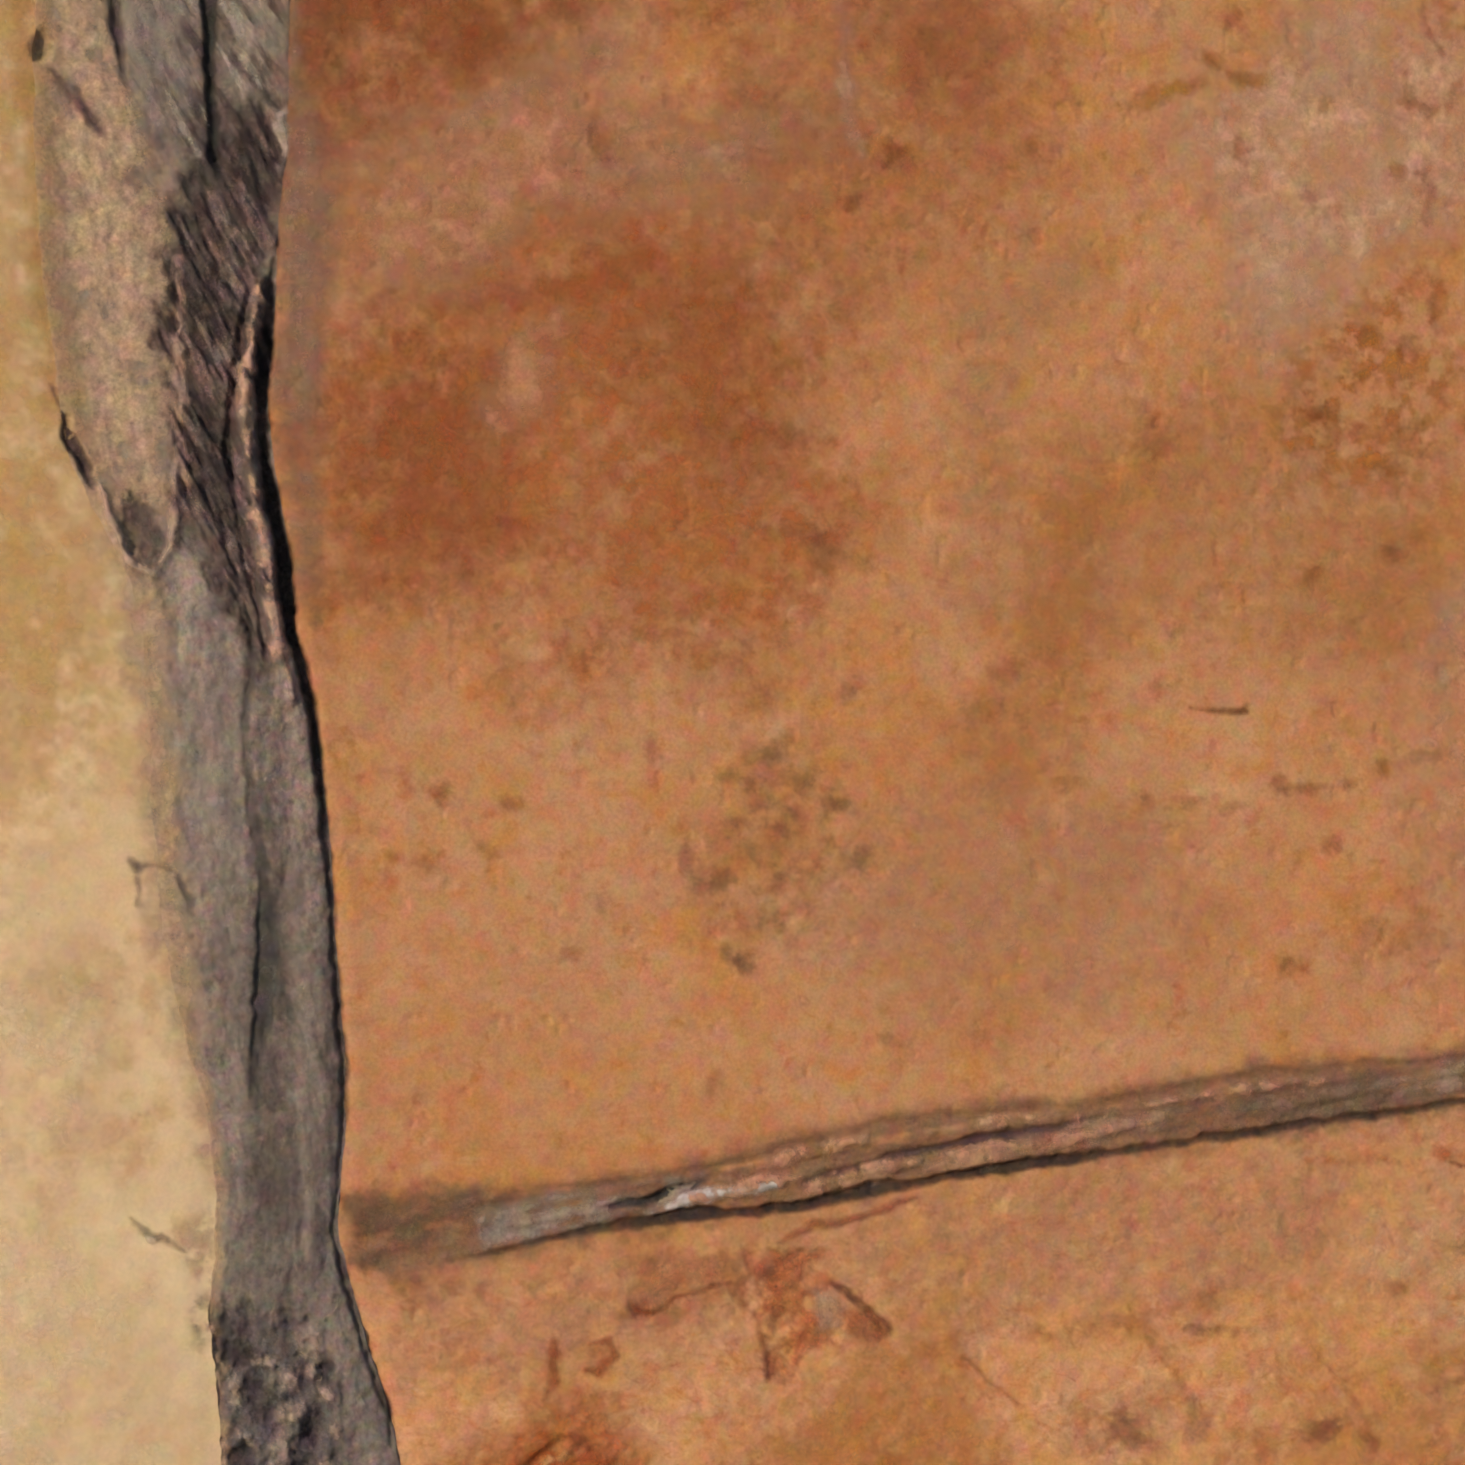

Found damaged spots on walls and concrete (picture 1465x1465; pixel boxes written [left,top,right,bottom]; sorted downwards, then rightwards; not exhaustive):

crack [202,0,220,178]
crack [225,281,348,1131]
crack [132,862,143,871]
crack [180,881,191,903]
flaking render [345,1050,1465,1279]
crack [494,1059,1465,1253]
crack [332,1228,390,1412]
flaking render [468,1338,643,1465]
flaking render [631,1199,910,1379]